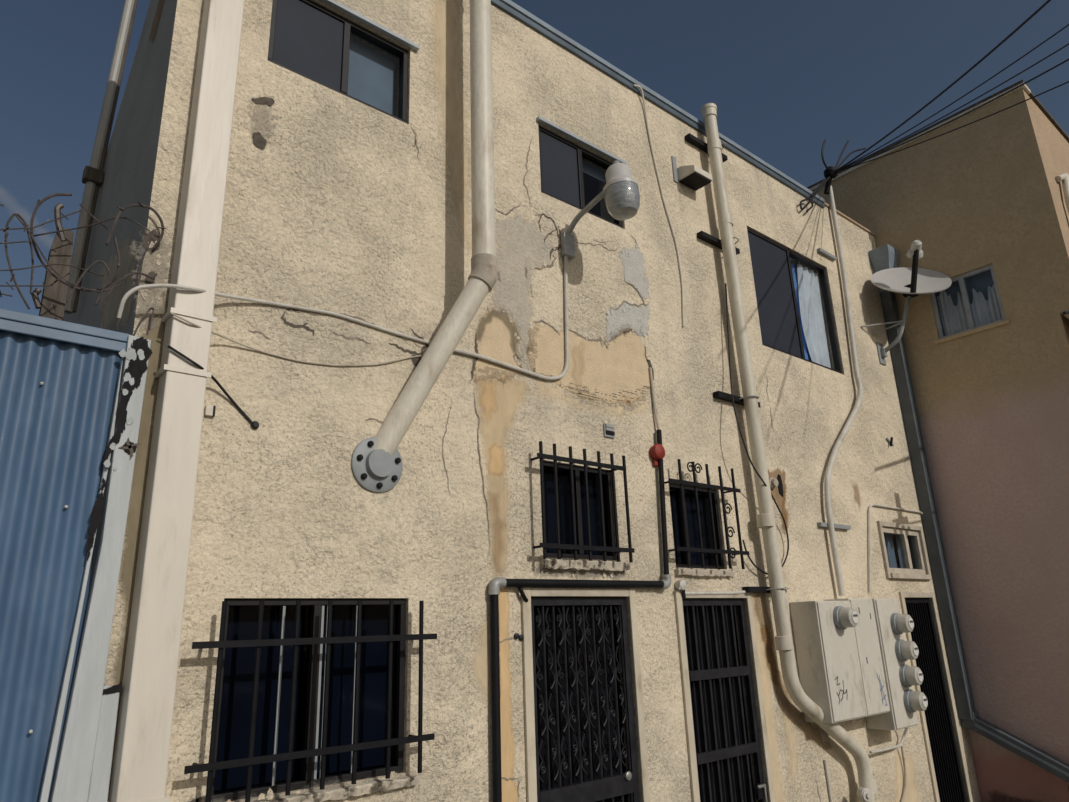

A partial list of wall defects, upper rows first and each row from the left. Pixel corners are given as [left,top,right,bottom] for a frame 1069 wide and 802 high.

crack [496,139,640,251]
crack [249,306,429,367]
peeling [471,214,654,405]
crack [442,388,490,556]